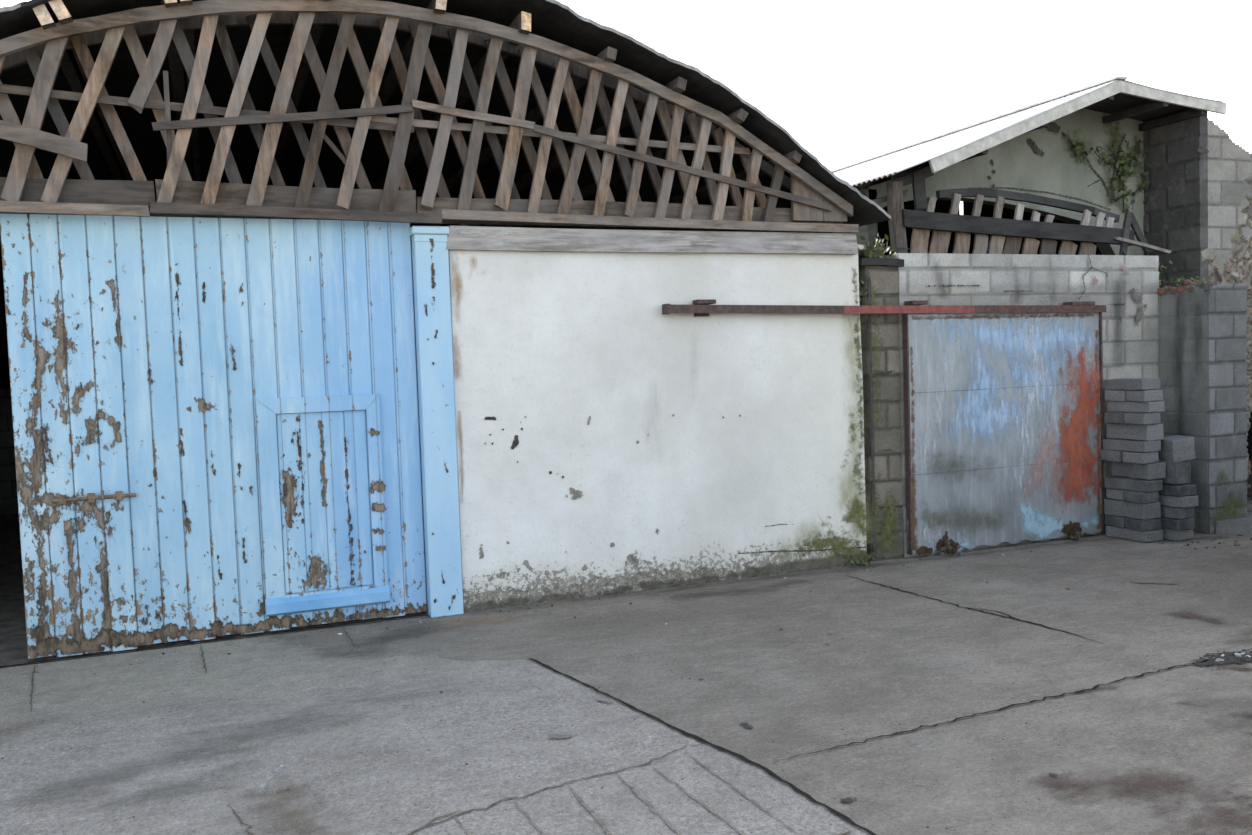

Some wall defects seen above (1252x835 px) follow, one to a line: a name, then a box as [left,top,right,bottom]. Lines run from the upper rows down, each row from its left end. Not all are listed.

peeling [5,272,165,644]
peeling [279,415,328,532]
peeling [286,548,332,593]
peeling [343,437,387,586]
spalling [484,416,526,463]
spalling [549,471,583,500]
leakage [464,475,881,613]
crack [773,649,1252,764]
crack [230,806,254,835]